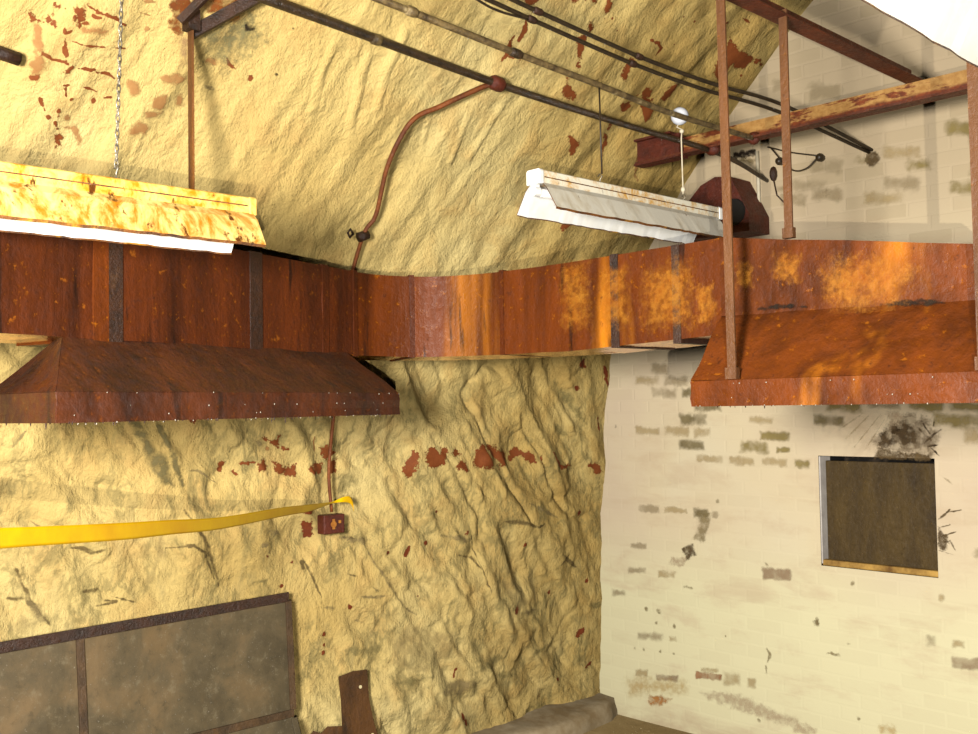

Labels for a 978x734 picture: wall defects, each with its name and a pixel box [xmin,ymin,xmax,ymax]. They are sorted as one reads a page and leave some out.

flaking render [948,122,969,134]
flaking render [815,404,859,425]
leakage [875,419,941,461]
flaking render [911,403,978,440]